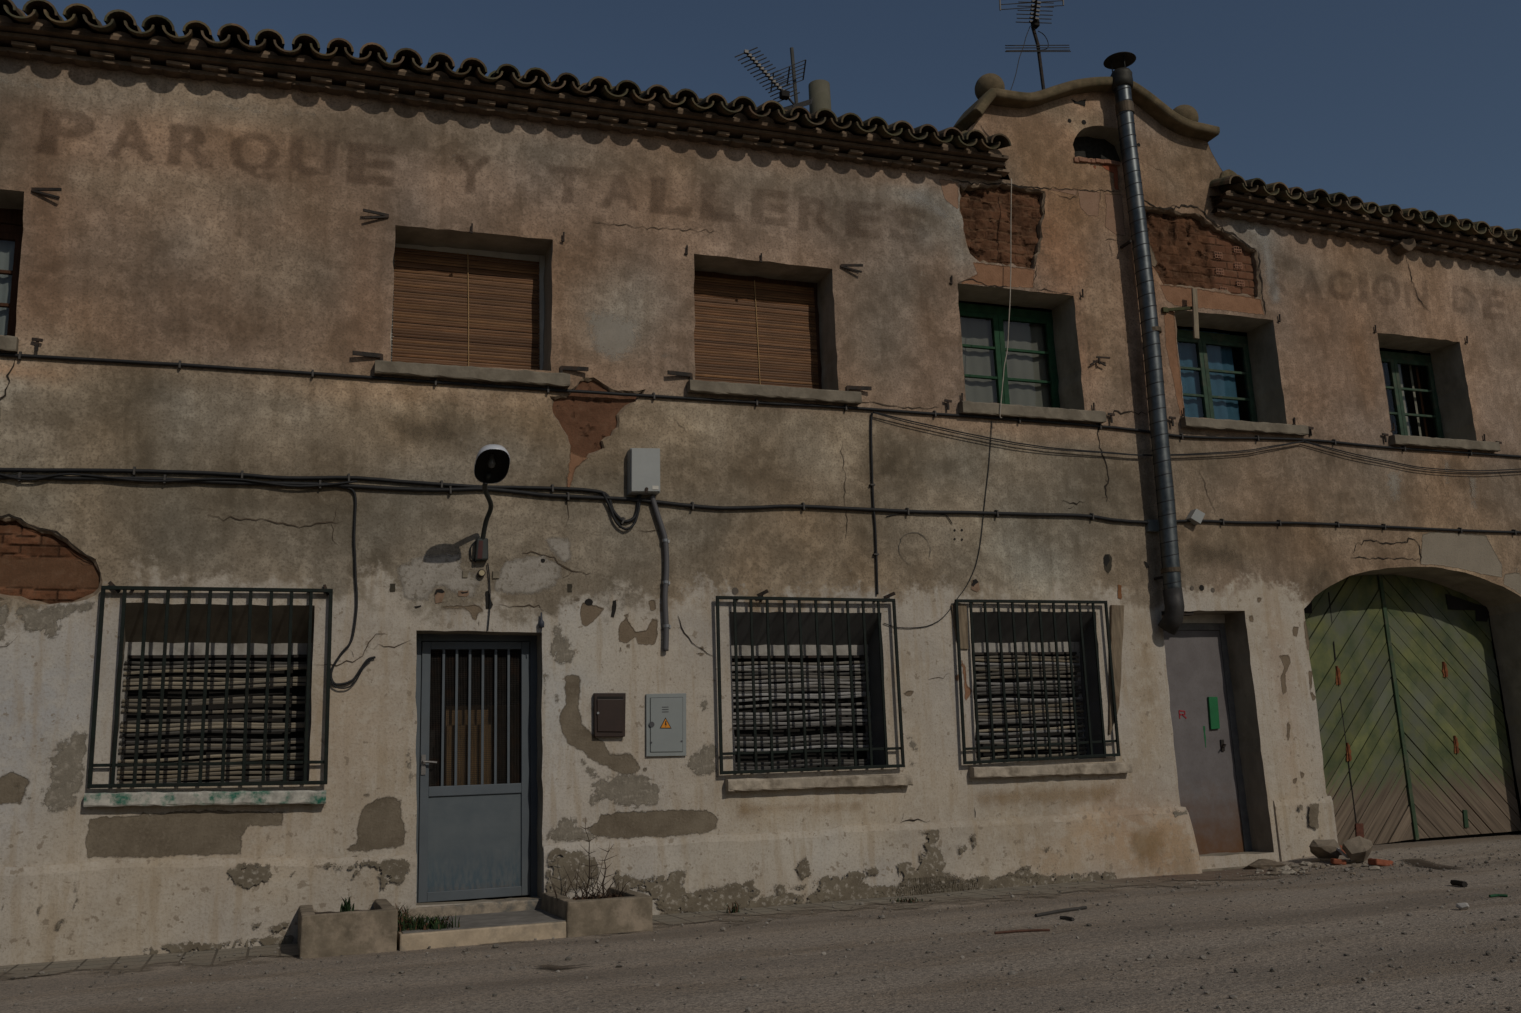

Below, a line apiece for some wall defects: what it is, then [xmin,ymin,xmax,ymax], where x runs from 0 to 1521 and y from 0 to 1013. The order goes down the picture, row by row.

spalling [1074,157,1120,190]
spalling [939,179,1042,288]
spalling [1146,213,1264,416]
crack [0,360,15,400]
spalling [552,380,643,487]
crack [0,514,96,560]
spalling [0,520,100,645]
peeling [398,538,571,624]
peeling [619,600,680,651]
peeling [543,624,1117,915]
peeling [85,810,283,888]
peeling [324,794,410,890]